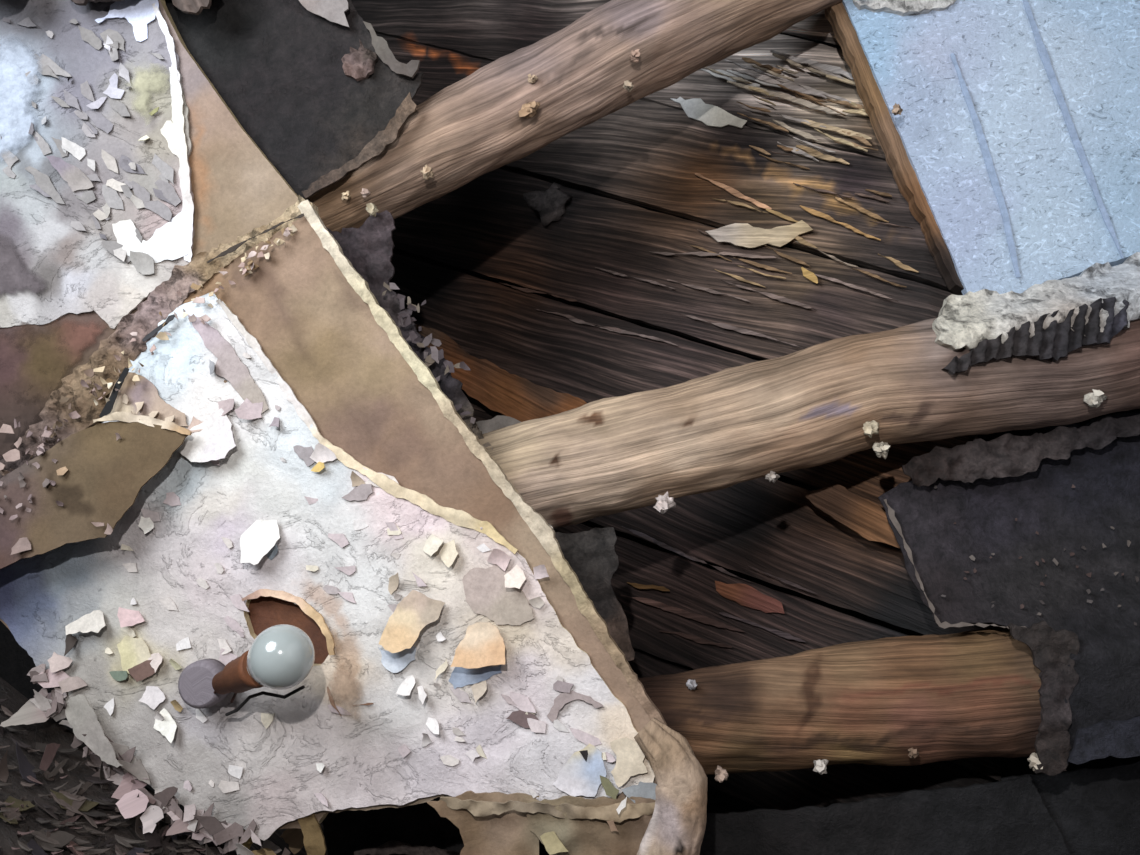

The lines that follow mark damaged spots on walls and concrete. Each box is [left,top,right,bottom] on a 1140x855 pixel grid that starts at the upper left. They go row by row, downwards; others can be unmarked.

spalling [853,0,956,16]
peeling [0,0,194,275]
peeling [670,97,747,129]
peeling [382,282,470,375]
spalling [932,252,1140,351]
peeling [0,315,280,572]
peeling [280,443,337,472]
peeling [342,471,399,501]
peeling [423,534,458,568]
peeling [378,543,549,704]
peeling [0,594,304,855]
peeling [501,675,657,803]